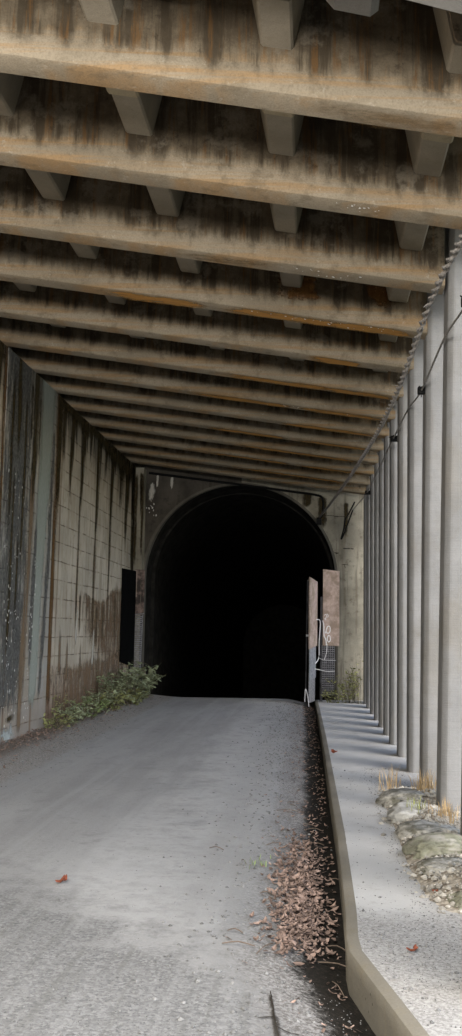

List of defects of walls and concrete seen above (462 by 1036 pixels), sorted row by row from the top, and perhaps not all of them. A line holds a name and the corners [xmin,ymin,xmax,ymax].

damp [0,341,173,742]